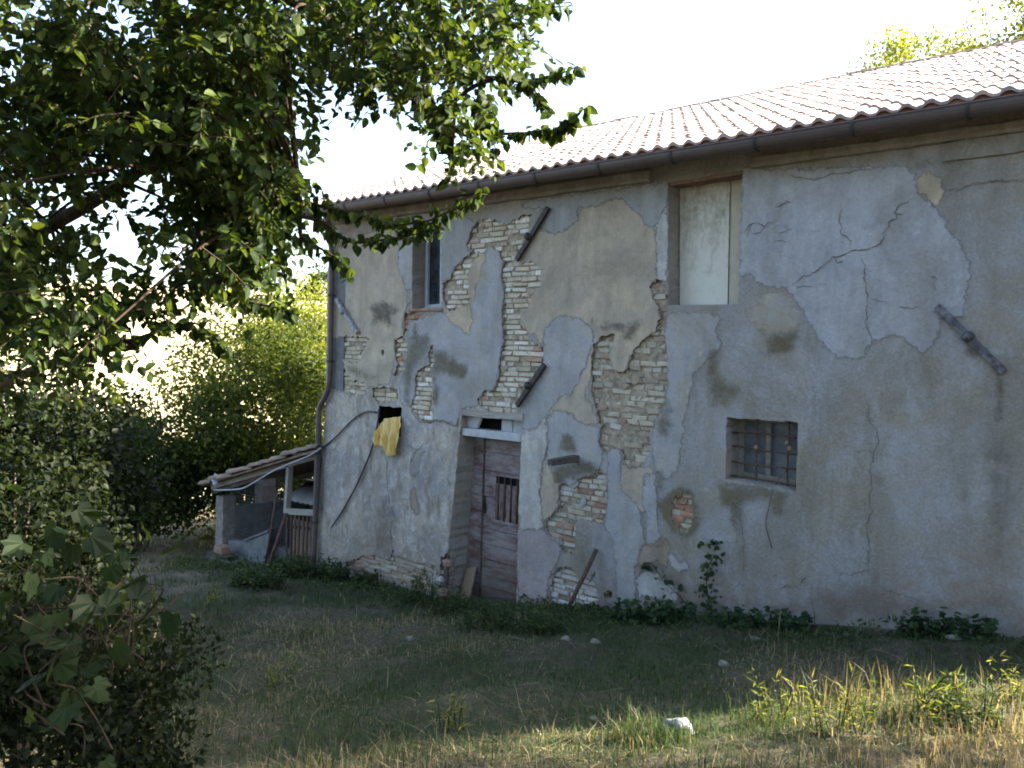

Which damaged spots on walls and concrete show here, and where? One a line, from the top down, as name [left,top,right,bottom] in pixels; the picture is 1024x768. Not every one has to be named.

peeling [324,229,435,424]
peeling [442,198,669,605]
crack [746,167,874,242]
crack [789,197,916,348]
peeling [916,171,945,206]
flaking render [343,549,456,595]
flaking render [670,493,694,534]
crack [839,391,880,580]